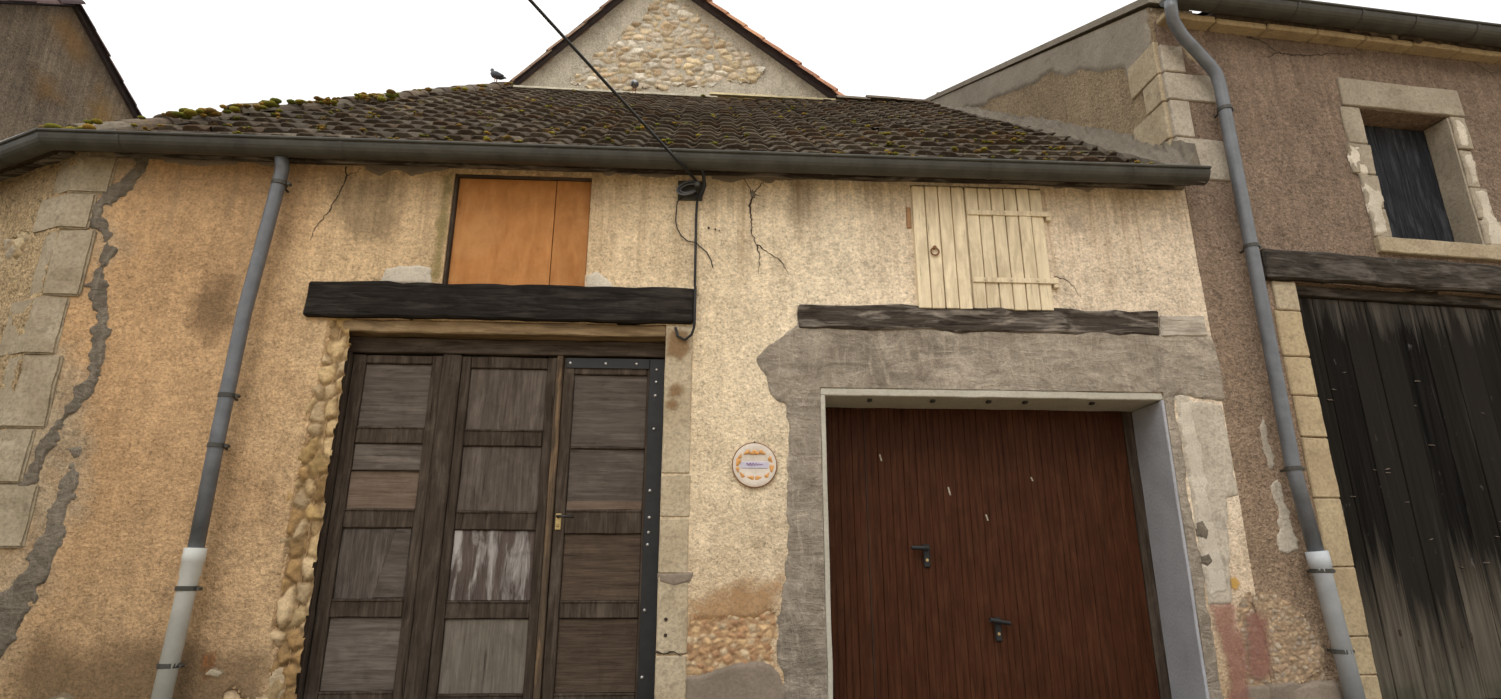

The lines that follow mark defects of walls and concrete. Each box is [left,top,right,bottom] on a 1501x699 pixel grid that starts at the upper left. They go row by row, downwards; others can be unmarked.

crack [1247,36,1352,57]
crack [744,179,788,274]
peeling [1347,145,1387,234]
flaking render [1177,400,1325,699]
flaking render [682,610,781,676]